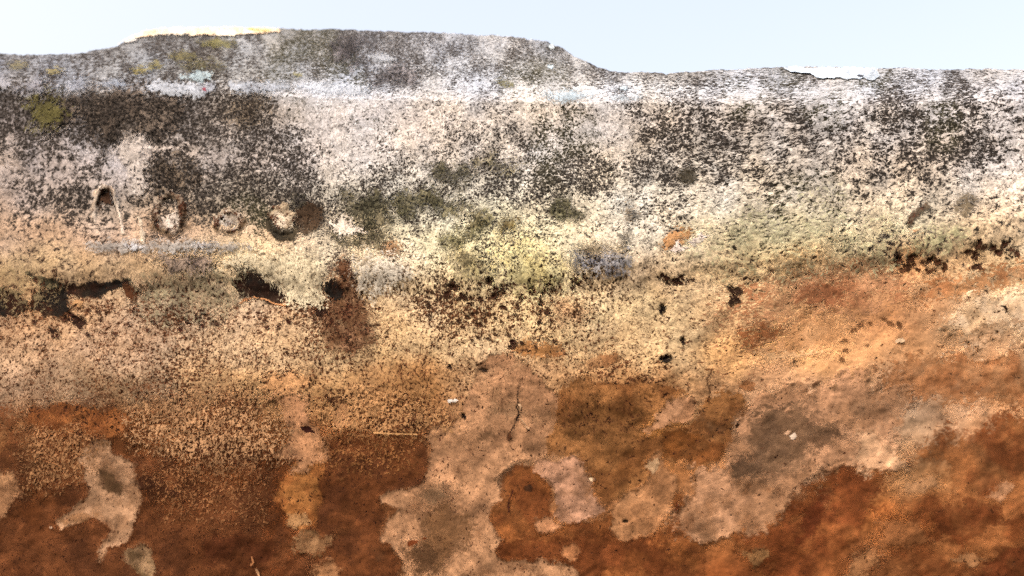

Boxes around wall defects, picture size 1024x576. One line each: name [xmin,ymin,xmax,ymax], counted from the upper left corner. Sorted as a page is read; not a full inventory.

leakage [0,71,43,99]
leakage [147,70,372,100]
leakage [113,130,154,200]
leakage [329,212,367,239]
corrosion [319,252,380,358]
leakage [348,246,418,307]
peeling [0,266,915,576]
corrosion [490,234,1024,576]
corrosion [0,366,449,576]
peeling [992,481,1014,501]
peeling [844,519,928,576]
peeling [951,553,979,567]